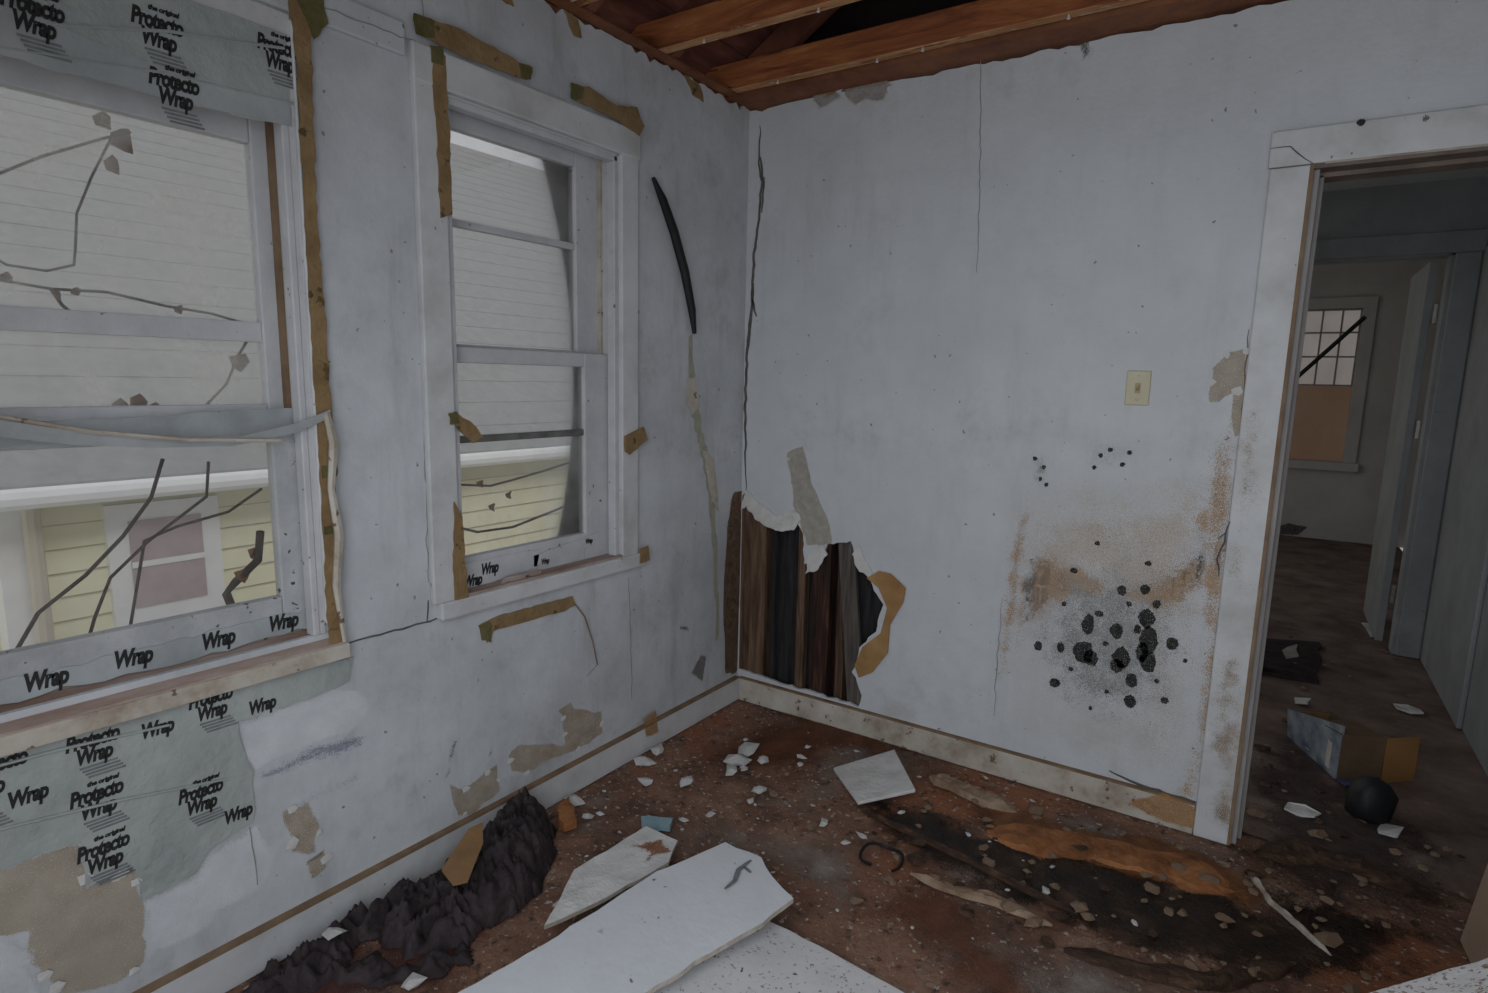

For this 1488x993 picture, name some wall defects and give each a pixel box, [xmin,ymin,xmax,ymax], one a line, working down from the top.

crack [743,128,765,491]
peeling [1207,348,1249,437]
peeling [723,447,832,675]
flaking render [852,546,872,576]
peeling [449,702,605,816]
damp [844,409,1481,987]
peeling [0,803,334,993]